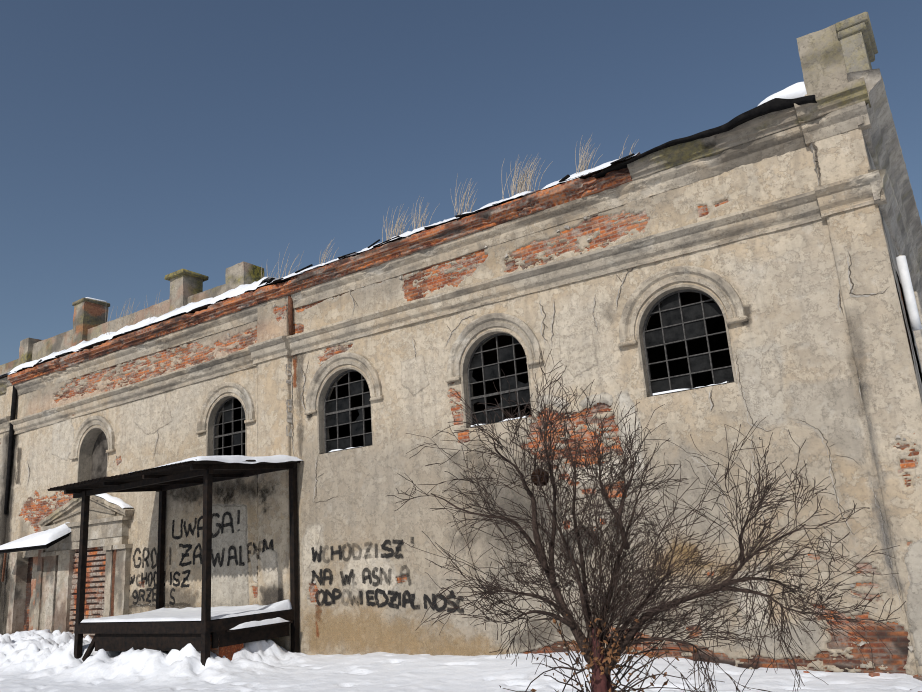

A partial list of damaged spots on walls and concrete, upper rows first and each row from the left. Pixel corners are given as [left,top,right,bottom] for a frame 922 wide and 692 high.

flaking render [504,209,650,273]
flaking render [399,246,488,301]
crack [539,300,556,348]
flaking render [54,326,257,403]
crack [707,390,715,411]
flaking render [521,392,644,498]
flaking render [19,490,73,533]
crack [687,454,728,521]
crack [733,351,911,620]
peeling [736,568,769,629]
flaking render [522,641,580,654]
flaking render [607,604,922,681]